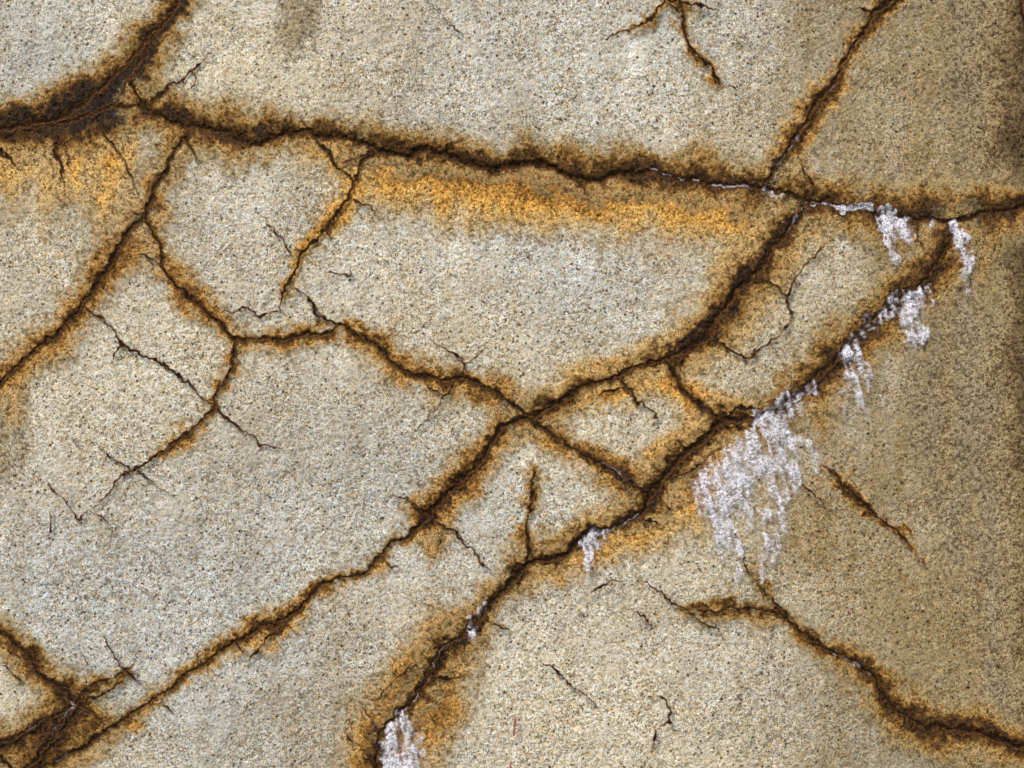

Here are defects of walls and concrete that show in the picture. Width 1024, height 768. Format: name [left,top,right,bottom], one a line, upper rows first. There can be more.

crack [1016,0,1024,32]
crack [0,0,894,320]
corrosion [0,0,1024,531]
damp [833,203,910,262]
crack [848,203,1024,249]
corrosion [0,367,753,768]
damp [380,712,426,768]
crack [0,130,954,768]
damp [579,529,606,572]
damp [692,391,818,581]
crack [591,558,1024,750]
damp [841,334,872,404]